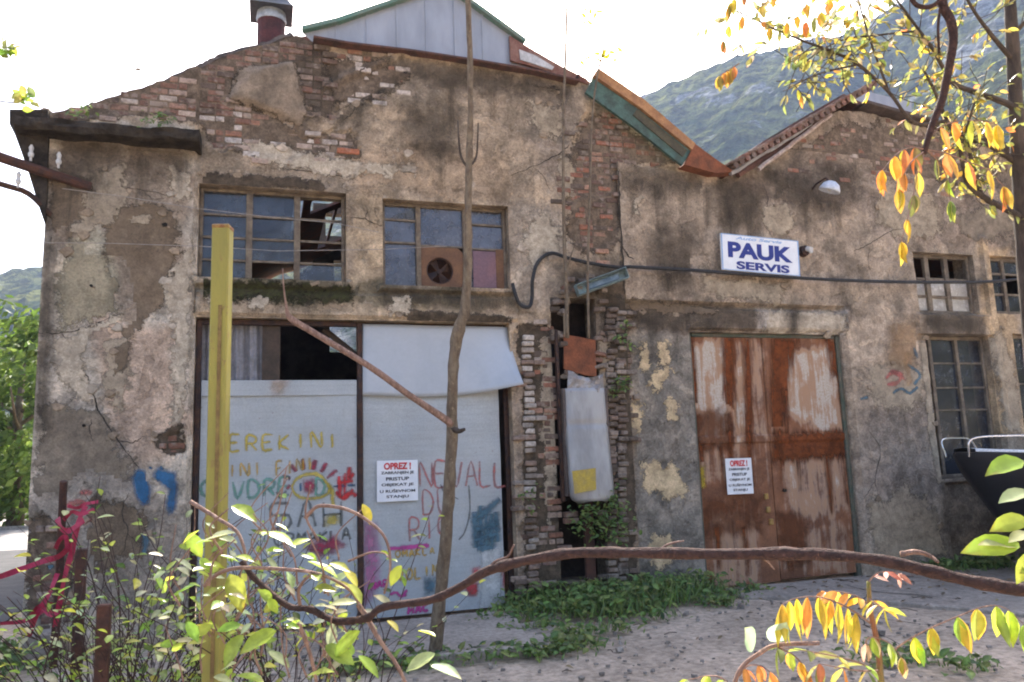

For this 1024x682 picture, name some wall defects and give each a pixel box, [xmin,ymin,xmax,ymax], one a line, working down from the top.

flaking render [788,117,1013,249]
crack [81,367,144,468]
flaking render [23,35,417,629]
corrosion [564,335,597,377]
flaking render [388,84,849,611]
corrosion [691,337,761,568]
corrosion [777,513,809,564]
corrosion [770,338,848,513]